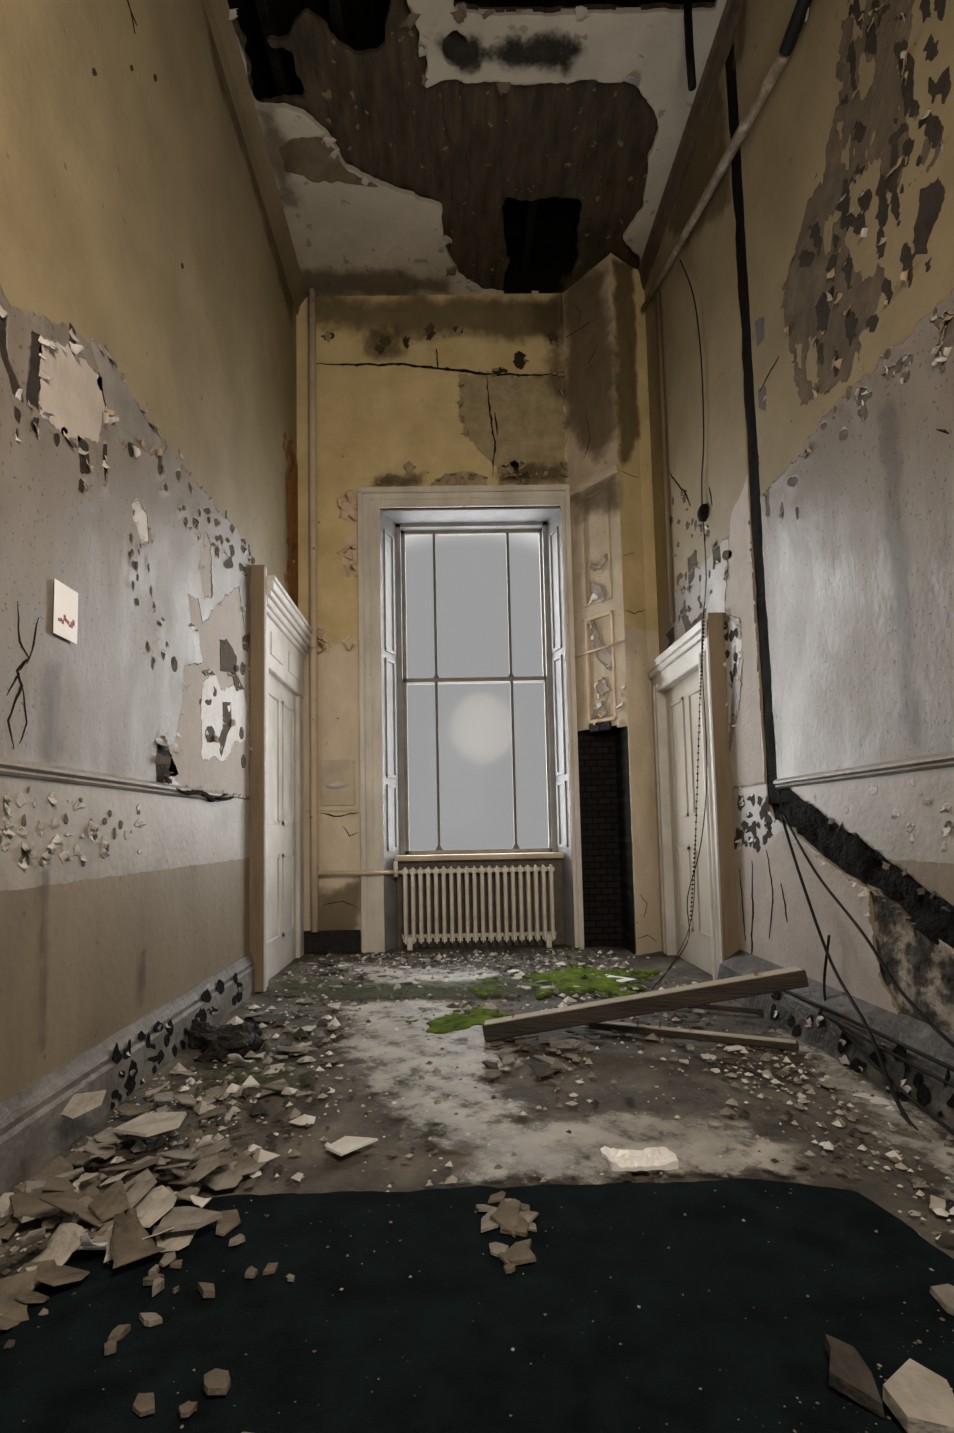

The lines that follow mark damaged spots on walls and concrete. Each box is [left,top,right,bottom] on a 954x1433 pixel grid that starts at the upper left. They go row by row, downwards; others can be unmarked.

spalling [639,0,716,10]
leakage [203,3,639,512]
spalling [229,0,658,290]
peeling [781,0,954,440]
crack [316,349,551,477]
peeling [0,305,255,796]
crack [7,601,39,750]
spalling [93,810,140,852]
peeling [587,553,626,725]
flaking render [666,475,898,1015]
peeling [111,973,244,1110]